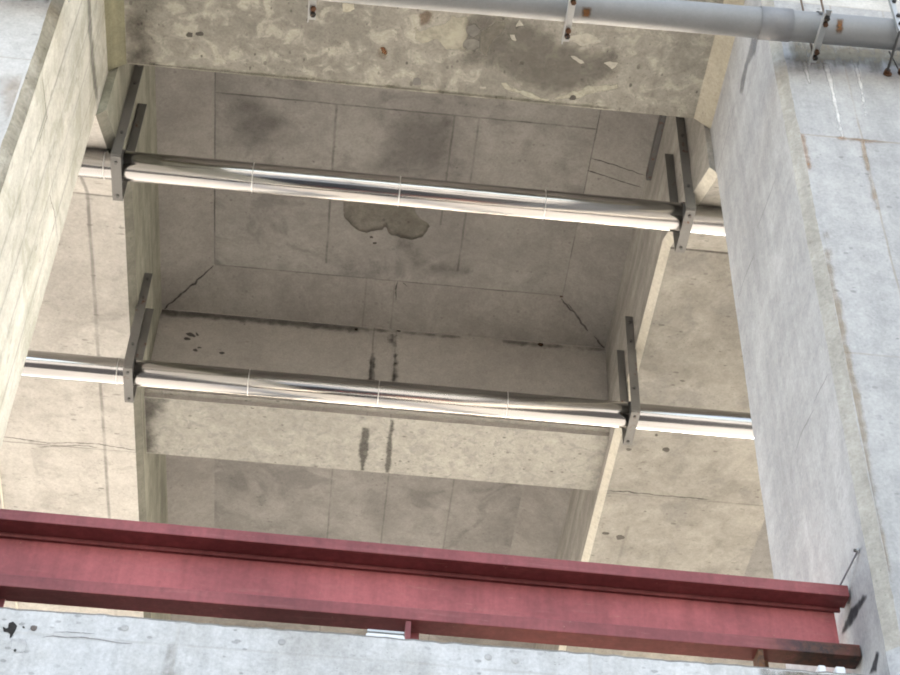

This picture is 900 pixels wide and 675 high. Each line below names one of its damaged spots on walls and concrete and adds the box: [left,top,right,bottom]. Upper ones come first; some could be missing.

water stain [468,16,618,101]
water stain [359,428,369,470]
water stain [385,421,394,473]
water stain [842,596,866,633]